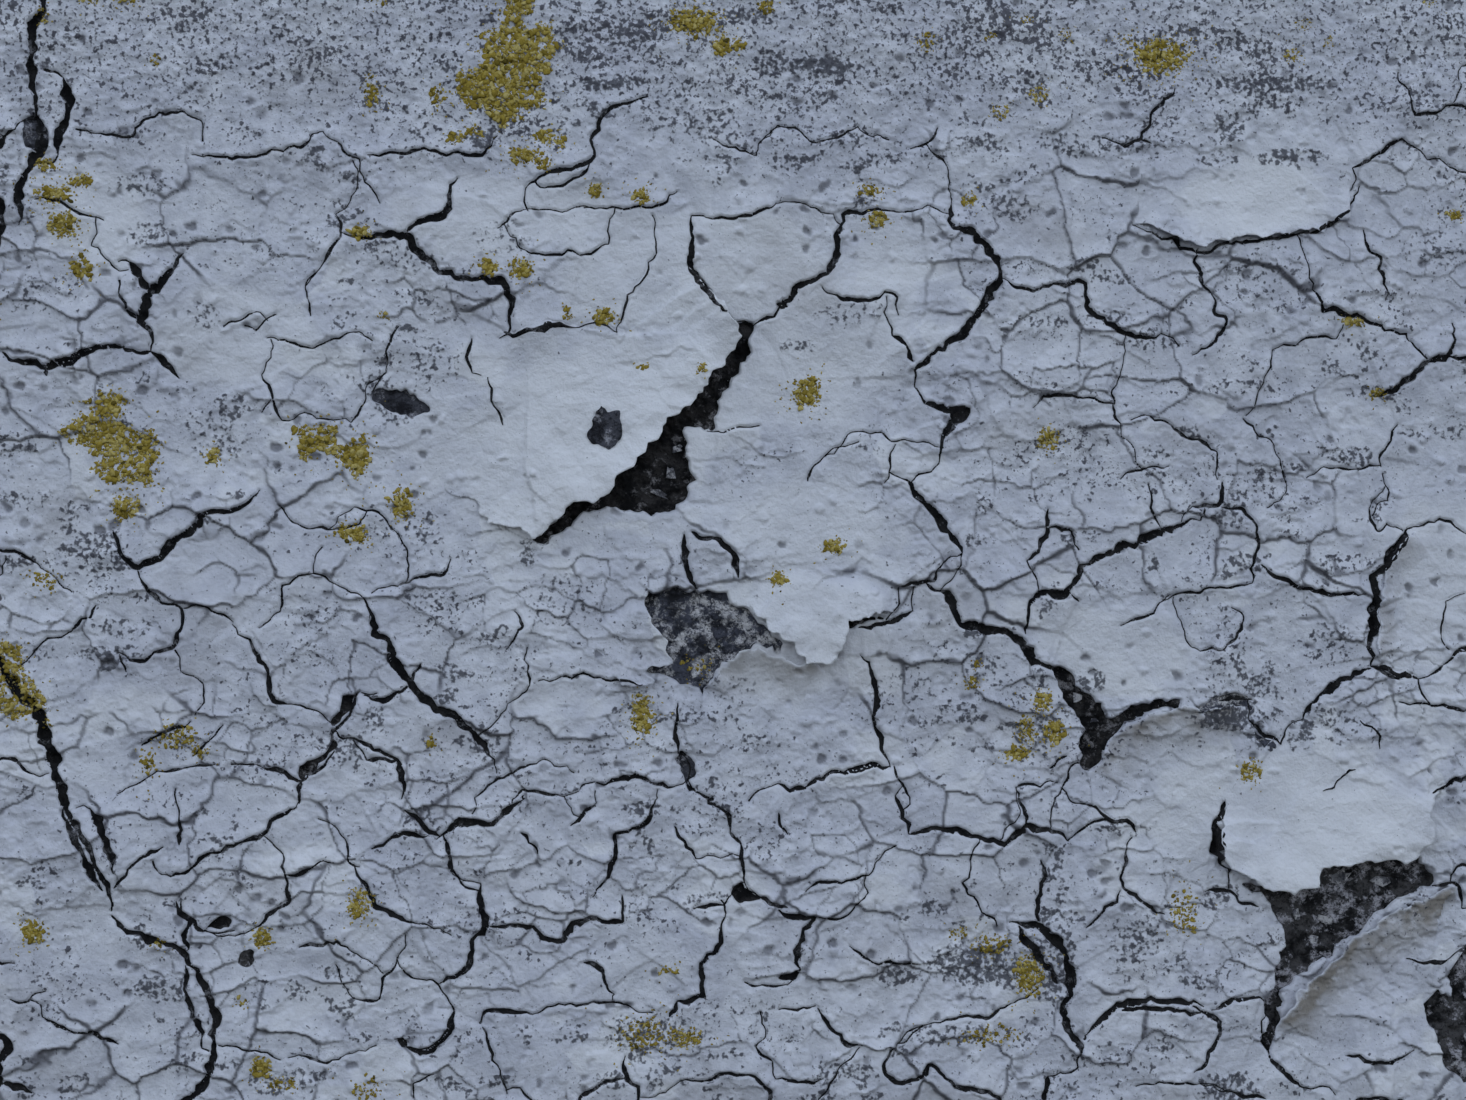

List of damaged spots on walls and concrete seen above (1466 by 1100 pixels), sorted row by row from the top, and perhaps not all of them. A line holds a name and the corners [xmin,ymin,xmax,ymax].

peeling [371,259,754,544]
crack [0,0,1466,745]
spalling [597,569,900,750]
crack [0,490,1402,1100]
spalling [1053,666,1466,1082]
crack [1406,947,1466,965]
crack [1432,863,1466,909]
crack [1433,776,1466,794]
crack [1347,1050,1414,1065]